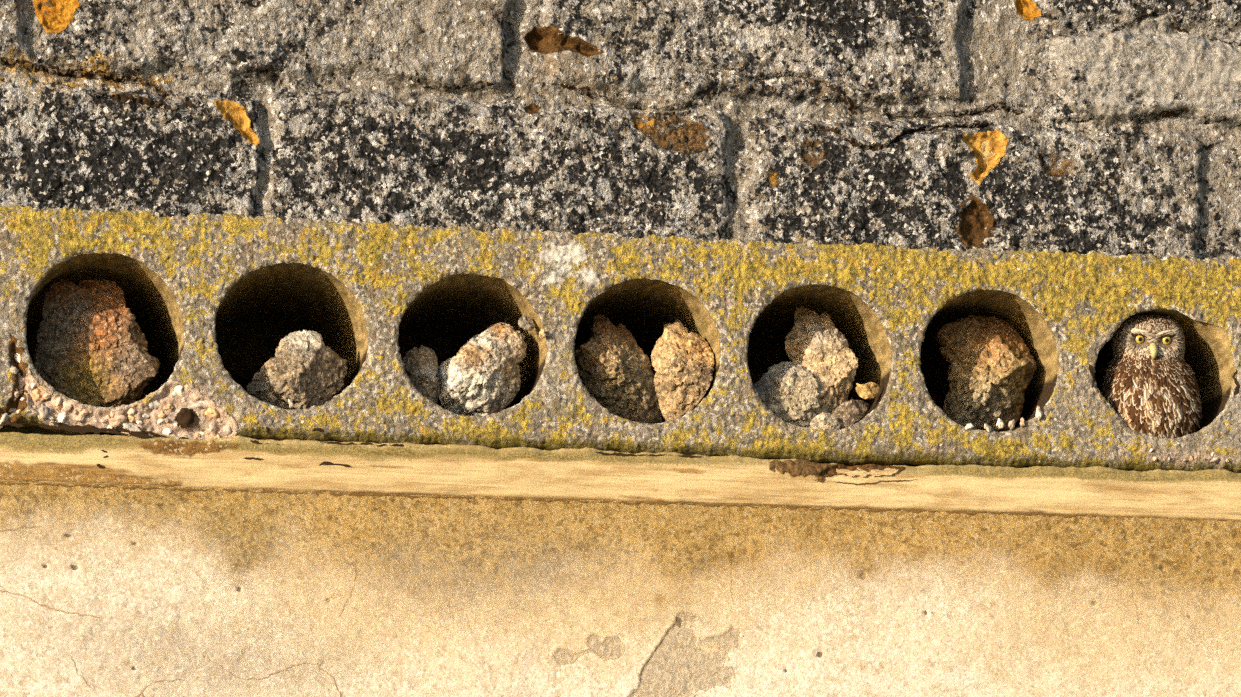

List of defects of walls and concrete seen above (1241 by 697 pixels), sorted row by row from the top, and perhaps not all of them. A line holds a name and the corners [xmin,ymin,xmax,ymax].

crack [560,83,628,106]
crack [802,83,1024,150]
spalling [0,335,238,440]
leakage [0,461,1241,593]
peeling [554,633,625,665]
peeling [628,611,744,697]